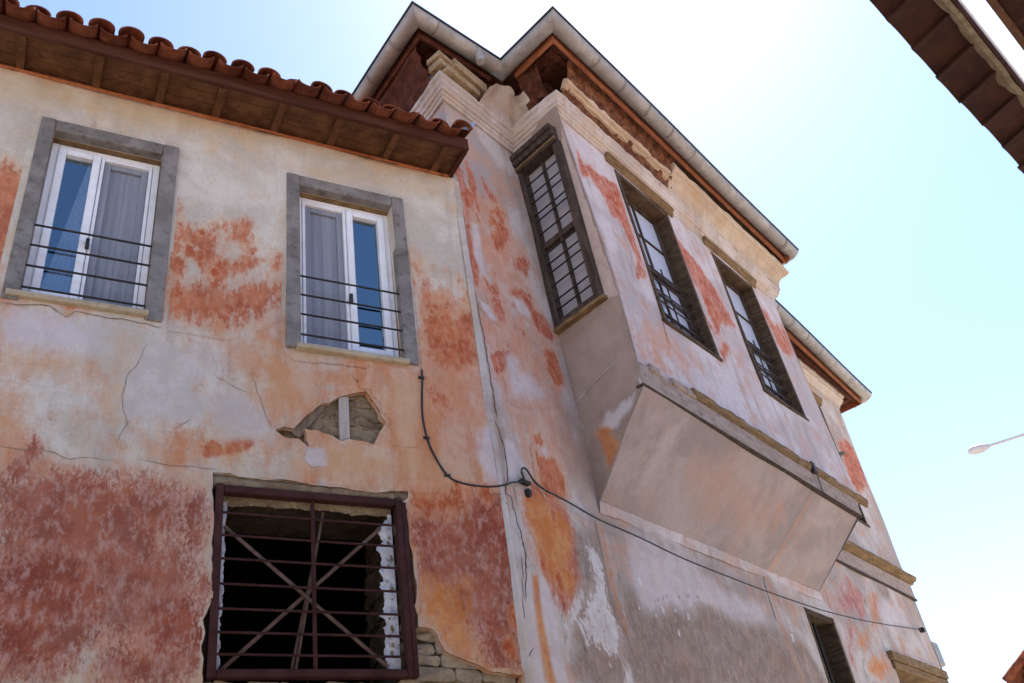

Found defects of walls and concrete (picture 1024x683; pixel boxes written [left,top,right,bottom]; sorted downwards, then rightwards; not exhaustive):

peeling [570,142,650,285]
crack [0,302,157,461]
peeling [0,148,629,683]
crack [475,292,527,600]
damp [549,298,828,683]